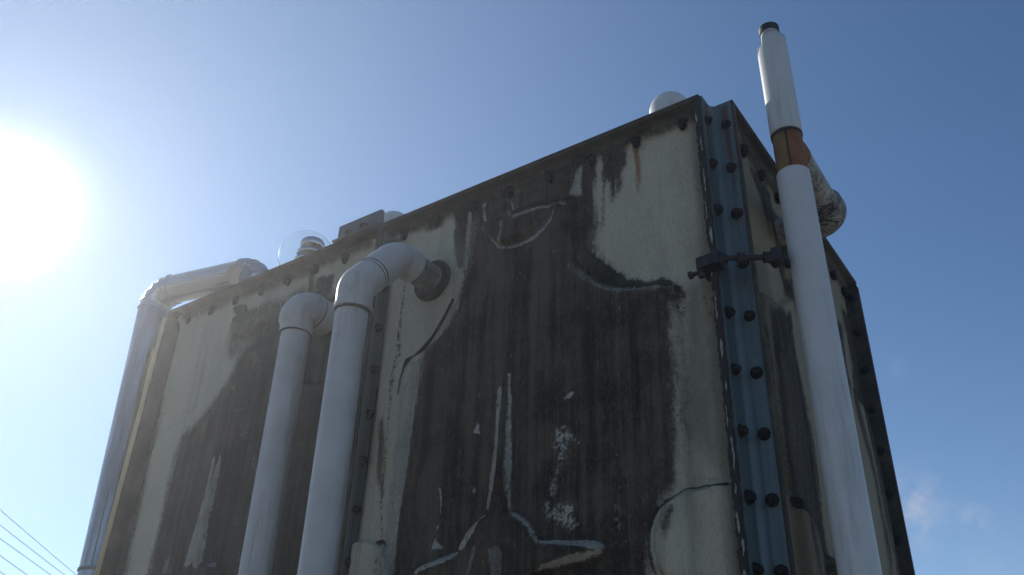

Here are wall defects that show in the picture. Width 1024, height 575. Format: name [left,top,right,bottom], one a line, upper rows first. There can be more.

leakage [115,399,162,575]
leakage [147,238,371,575]
peeling [414,373,604,575]
leakage [380,111,729,575]